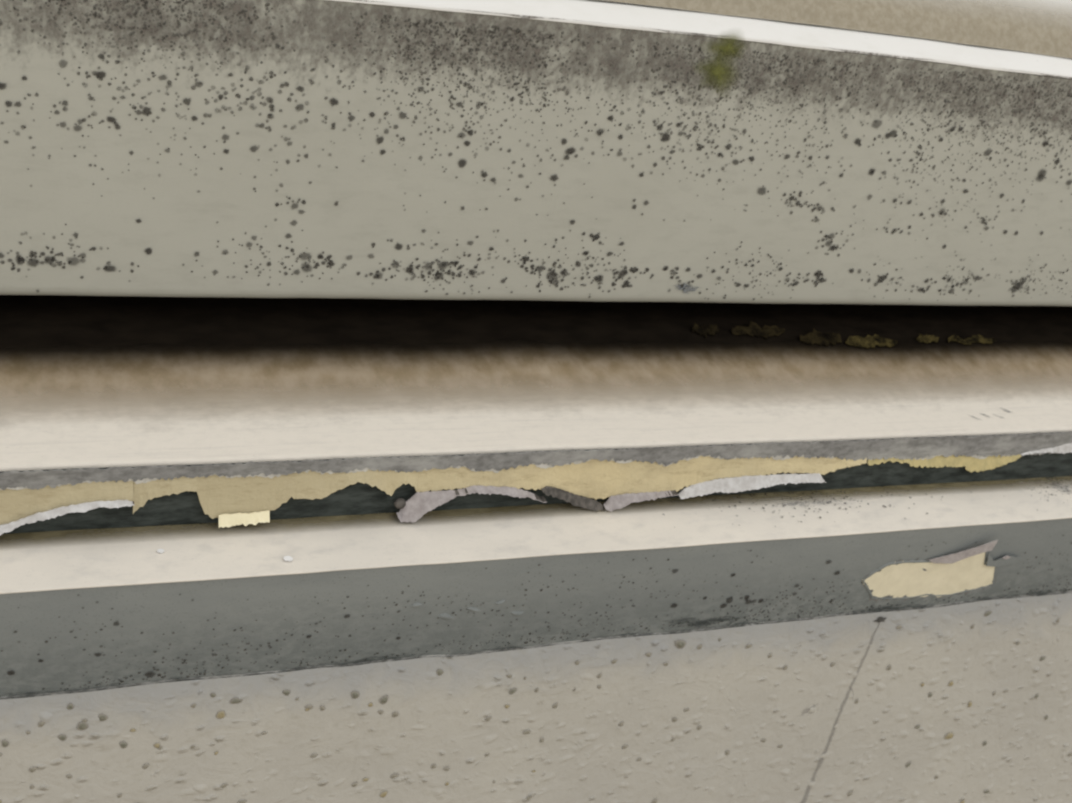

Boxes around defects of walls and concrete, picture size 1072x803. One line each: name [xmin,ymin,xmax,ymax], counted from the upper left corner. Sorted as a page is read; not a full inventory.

damp [0,0,1072,256]
damp [0,224,109,272]
damp [232,185,339,286]
damp [357,220,833,300]
damp [849,263,989,301]
damp [1011,254,1069,297]
peeling [0,431,1072,535]
peeling [861,540,1021,602]